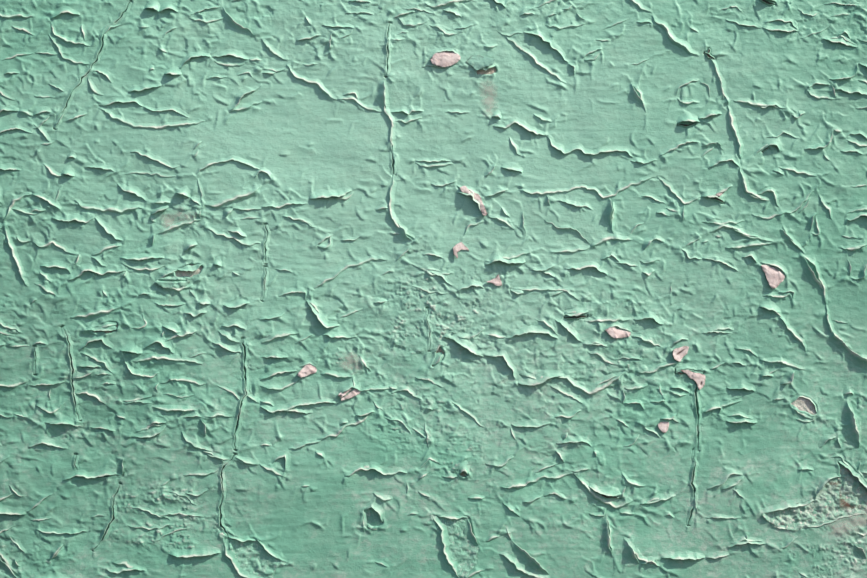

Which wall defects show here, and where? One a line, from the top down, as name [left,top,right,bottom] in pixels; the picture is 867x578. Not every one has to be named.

peeling [421,47,496,75]
crack [261,23,415,243]
crack [0,163,39,287]
peeling [431,179,515,258]
crack [627,0,867,448]
peeling [742,250,789,288]
crack [202,319,260,539]
peeling [259,353,426,438]
peeling [603,321,705,390]
crack [676,366,704,525]
peeling [760,454,867,531]
crack [499,540,551,578]